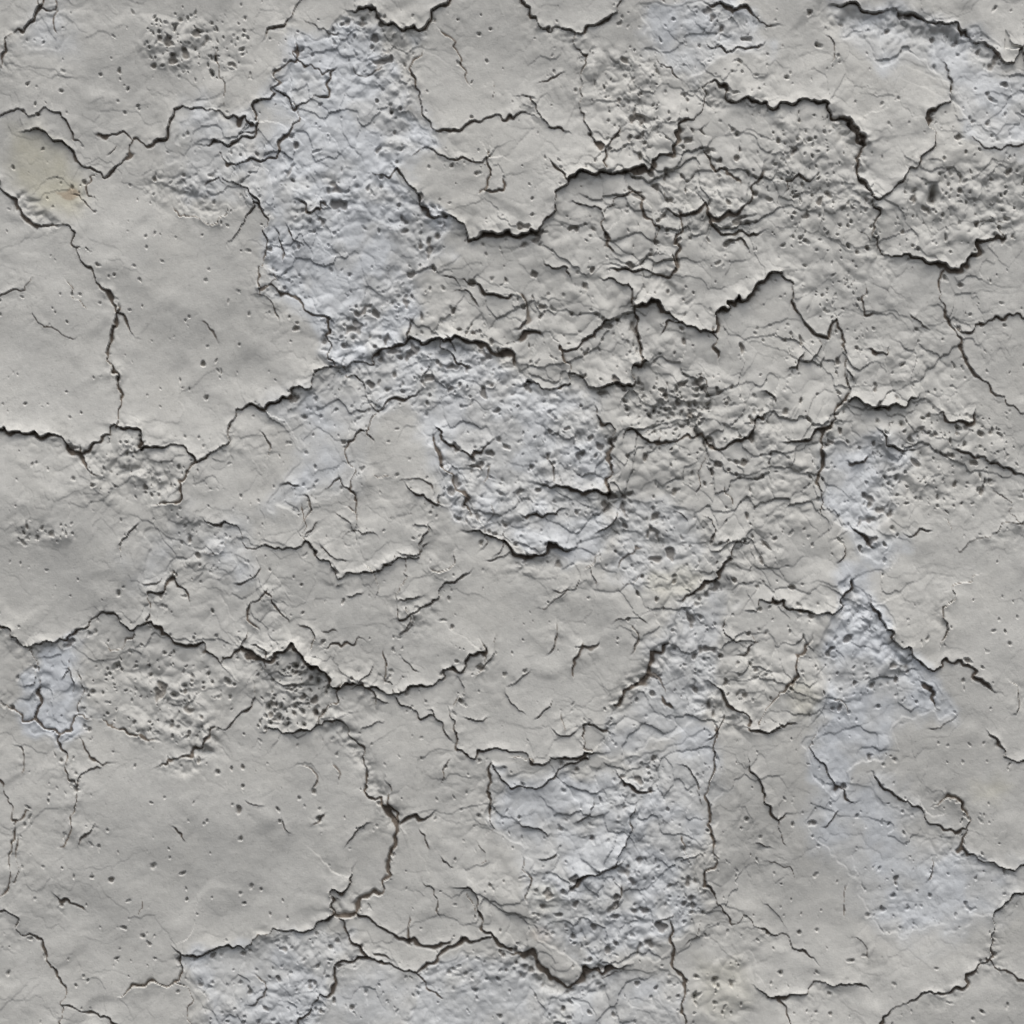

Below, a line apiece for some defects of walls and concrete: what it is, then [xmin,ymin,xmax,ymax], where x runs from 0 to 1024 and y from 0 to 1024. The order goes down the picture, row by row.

spalling [31,641,235,742]
crack [0,560,677,1024]
peeling [163,13,733,1024]
crack [0,0,1024,624]
crack [654,915,689,1024]
crack [679,522,1024,1024]
peeling [801,589,1019,938]